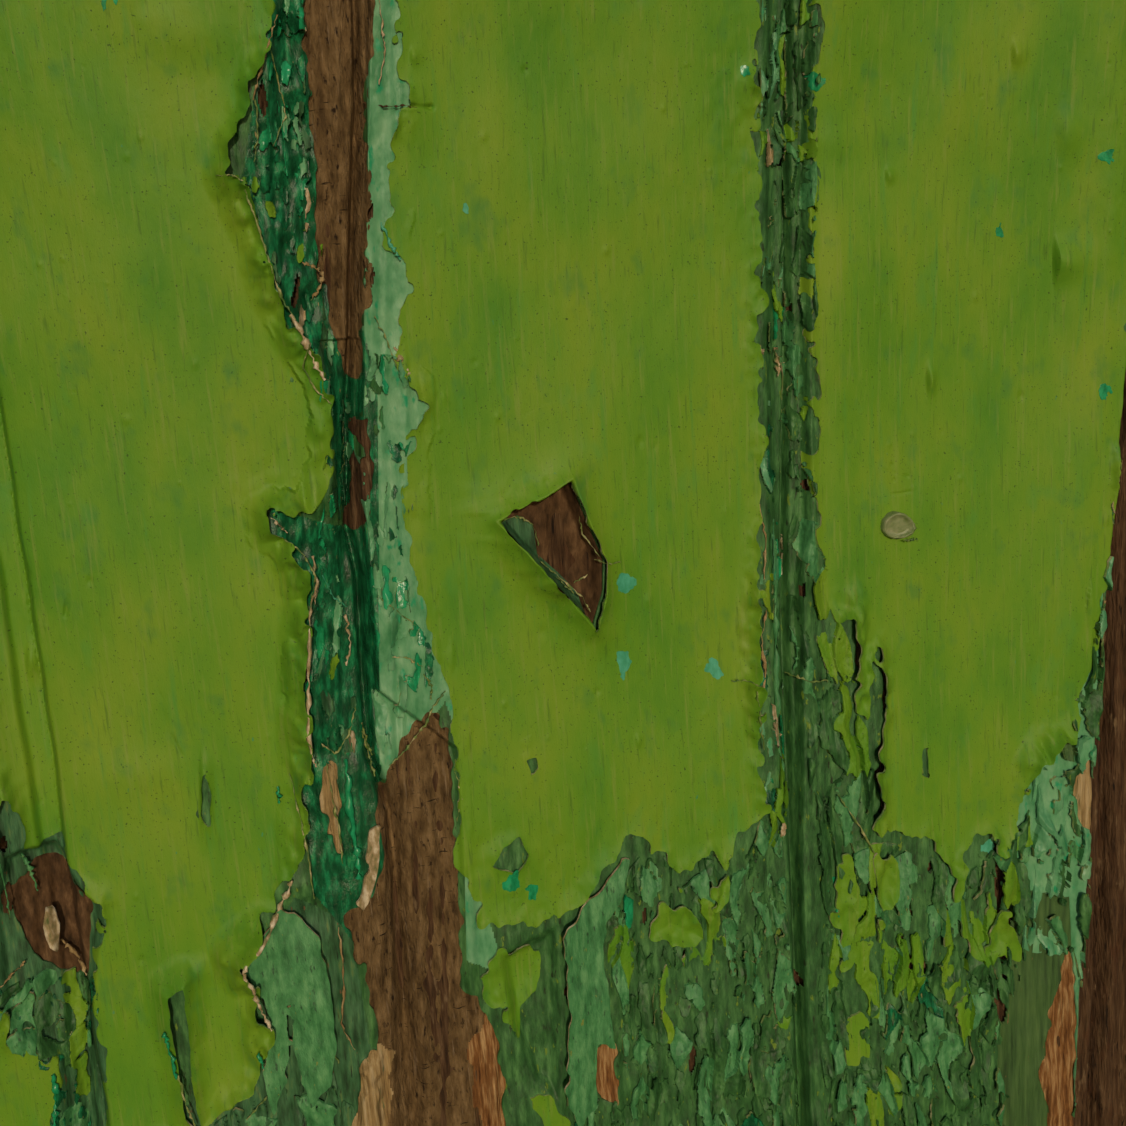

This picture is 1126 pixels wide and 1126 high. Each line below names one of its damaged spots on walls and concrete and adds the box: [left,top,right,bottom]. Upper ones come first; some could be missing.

peeling [0,746,108,1126]
peeling [108,0,649,1126]
peeling [589,0,1122,1126]